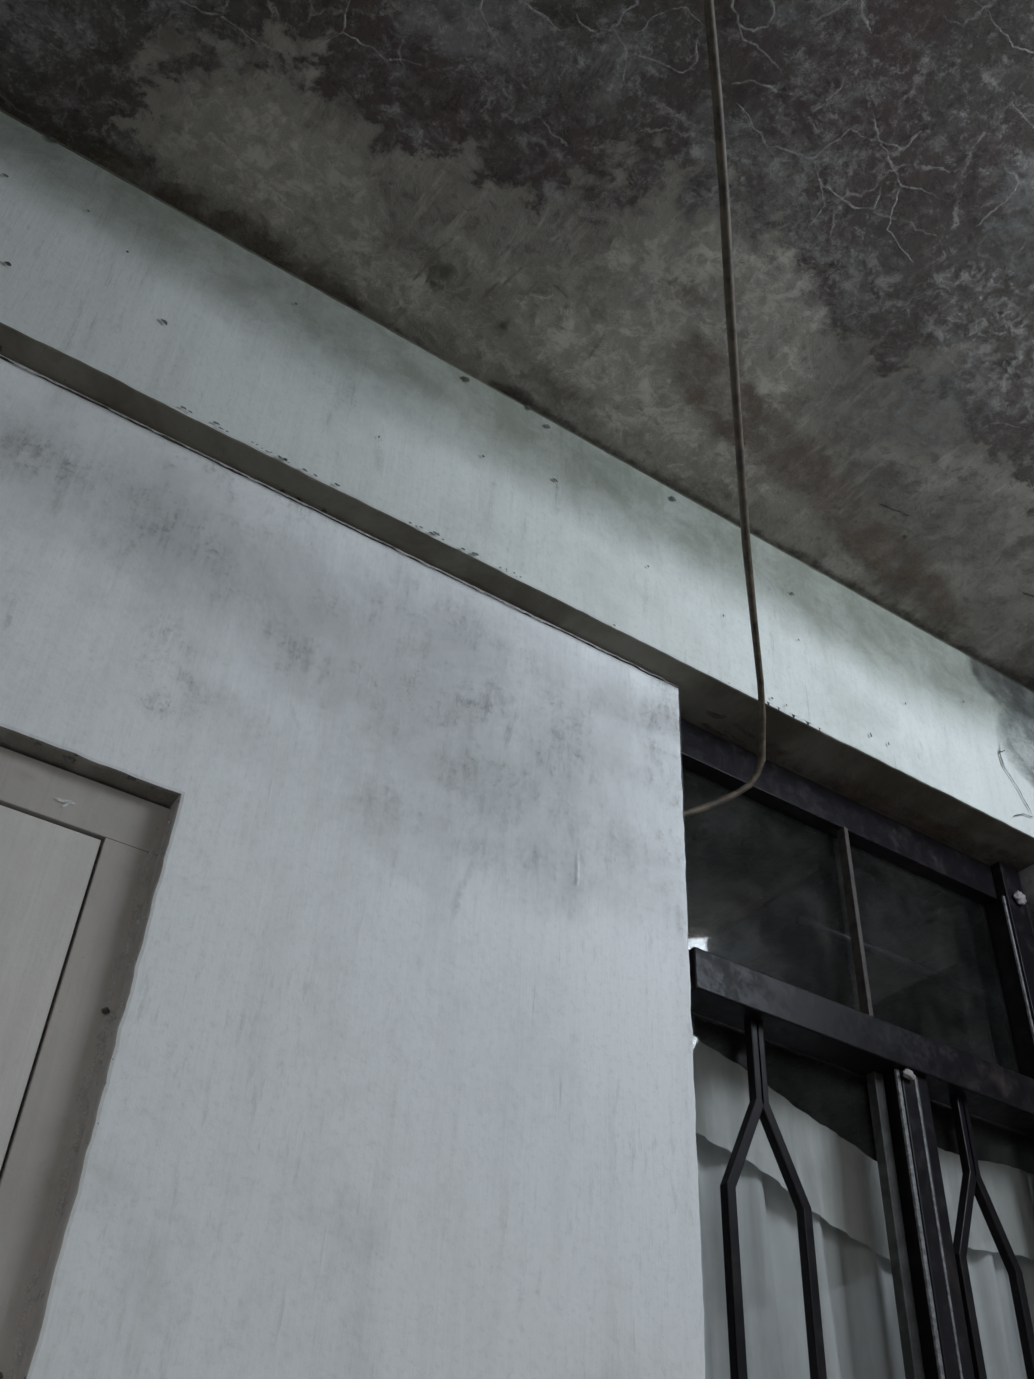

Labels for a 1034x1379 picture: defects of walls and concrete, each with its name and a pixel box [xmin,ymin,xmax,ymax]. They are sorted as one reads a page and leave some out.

crack [320,15,398,61]
crack [527,0,697,79]
crack [731,0,775,45]
crack [989,14,1034,53]
crack [733,83,922,261]
leakage [0,0,1034,779]